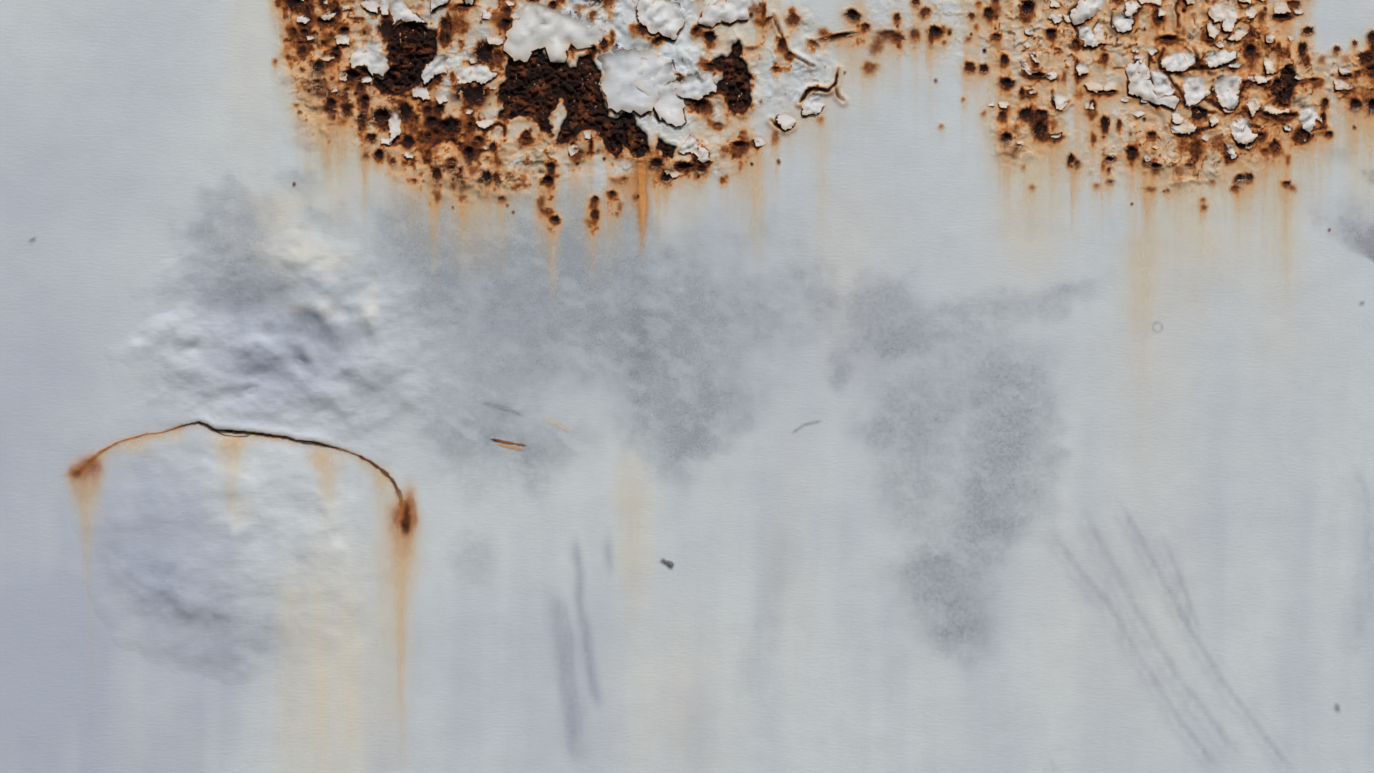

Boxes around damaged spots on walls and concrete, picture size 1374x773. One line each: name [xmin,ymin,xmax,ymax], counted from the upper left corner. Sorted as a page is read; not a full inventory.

rust [271,0,1374,239]
crack [69,422,417,556]